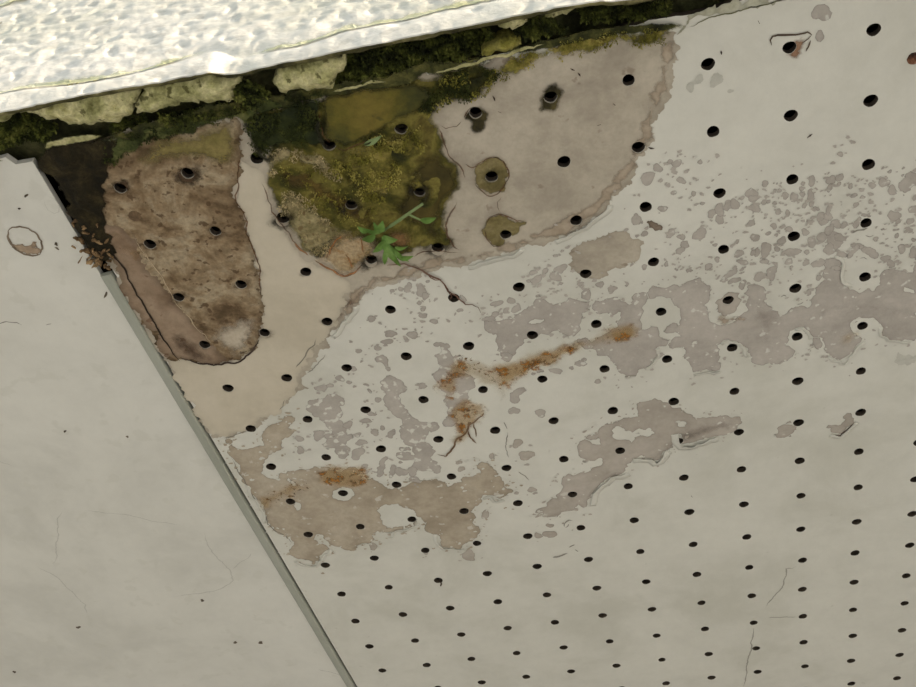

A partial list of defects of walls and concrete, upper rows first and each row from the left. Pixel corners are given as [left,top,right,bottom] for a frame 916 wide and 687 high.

leakage [505,23,681,54]
corrosion [790,41,803,58]
leakage [539,84,563,111]
leakage [37,56,490,366]
leakage [466,157,526,247]
crack [392,263,481,313]
peeling [126,31,916,574]
corrosion [438,352,556,399]
corrosion [451,401,475,440]
corrosion [319,468,367,486]